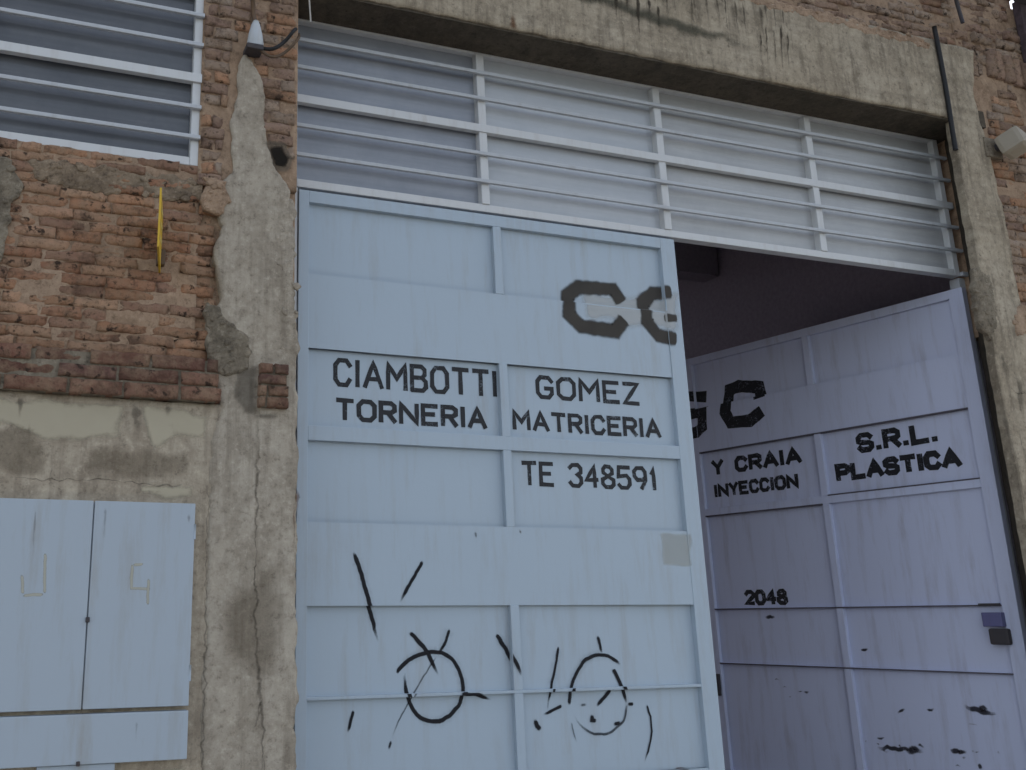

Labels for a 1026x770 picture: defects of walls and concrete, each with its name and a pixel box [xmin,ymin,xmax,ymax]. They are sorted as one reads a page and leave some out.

spalling [0,0,298,262]
damp [615,0,667,21]
spalling [953,9,1026,139]
spalling [202,302,252,376]
spalling [969,268,997,341]
spalling [992,153,1026,336]